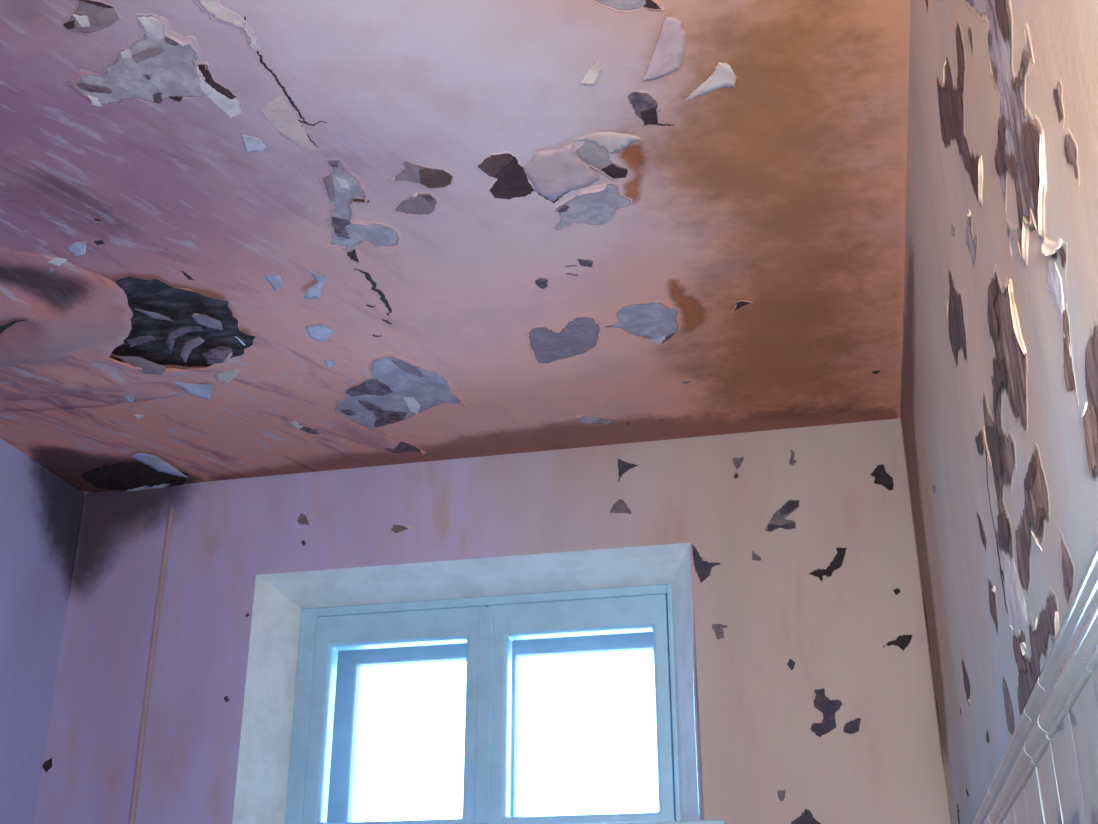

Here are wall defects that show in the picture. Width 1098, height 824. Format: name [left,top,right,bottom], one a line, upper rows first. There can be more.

peeling [63,0,122,36]
peeling [66,13,243,119]
crack [243,16,326,147]
peeling [476,0,686,232]
peeling [937,0,1098,486]
crack [354,269,392,337]
peeling [525,301,681,365]
peeling [331,355,467,431]
water stain [34,449,194,585]
spalling [80,453,200,491]
peeling [975,263,1075,737]
peeling [809,687,862,738]